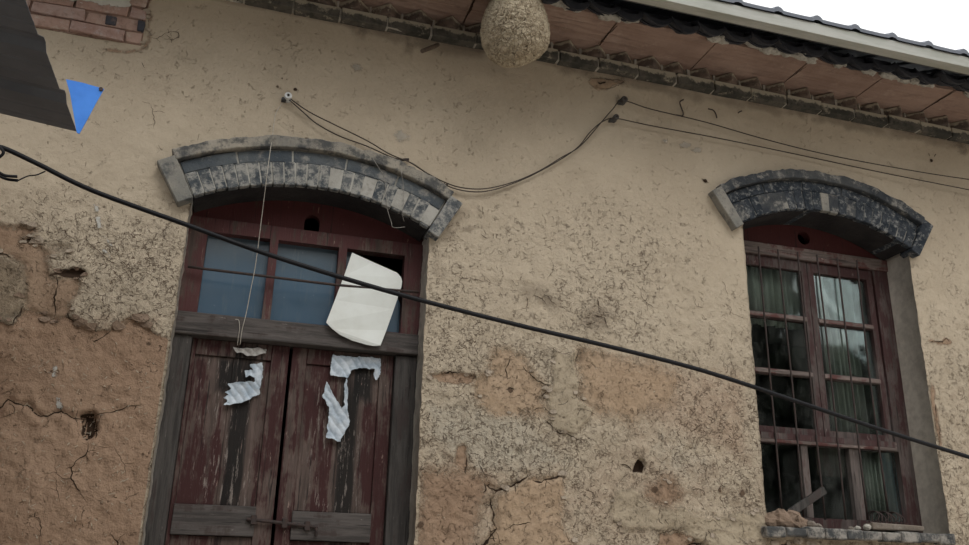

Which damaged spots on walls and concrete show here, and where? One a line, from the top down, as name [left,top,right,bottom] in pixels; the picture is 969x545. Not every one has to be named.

peeling [70,0,131,8]
flaking render [0,220,168,545]
crack [499,356,594,445]
flaking render [426,348,677,441]
crack [0,388,138,519]
crack [476,460,561,545]
flaking render [486,470,578,545]
spalling [621,460,644,473]
crack [658,505,719,545]
flaking render [610,475,816,545]